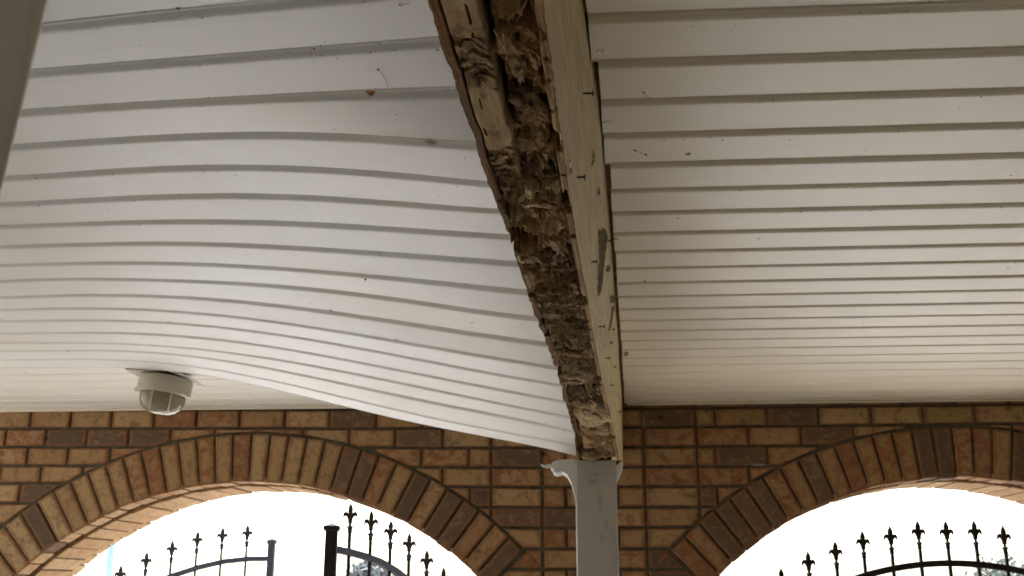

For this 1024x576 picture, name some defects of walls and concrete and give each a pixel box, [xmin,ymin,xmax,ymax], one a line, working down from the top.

peeling [596,226,615,331]